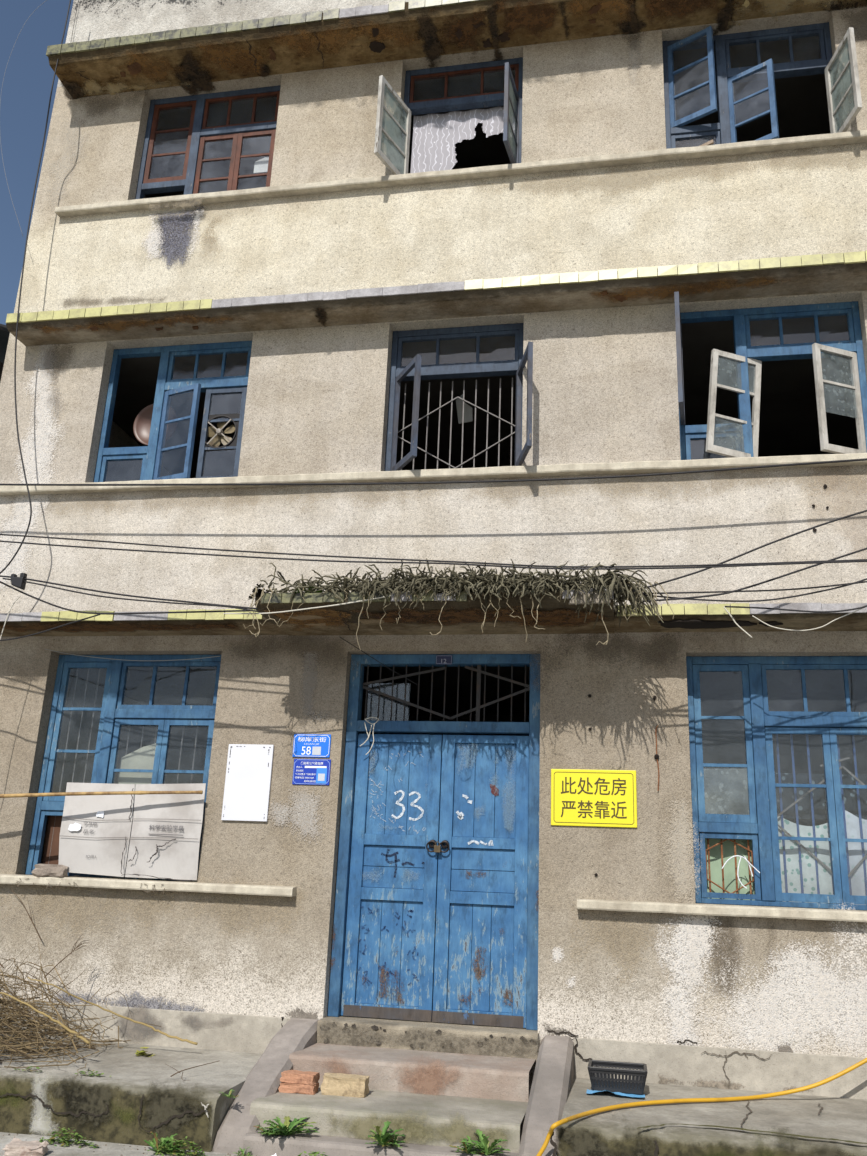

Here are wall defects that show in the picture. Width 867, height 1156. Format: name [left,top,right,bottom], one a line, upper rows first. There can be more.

leakage [61,50,215,100]
leakage [415,15,444,68]
leakage [486,5,503,61]
leakage [142,197,204,269]
leakage [662,799,700,899]
leakage [654,905,867,1058]
leakage [0,1080,61,1154]
crack [549,1131,557,1156]
crack [637,1051,867,1156]